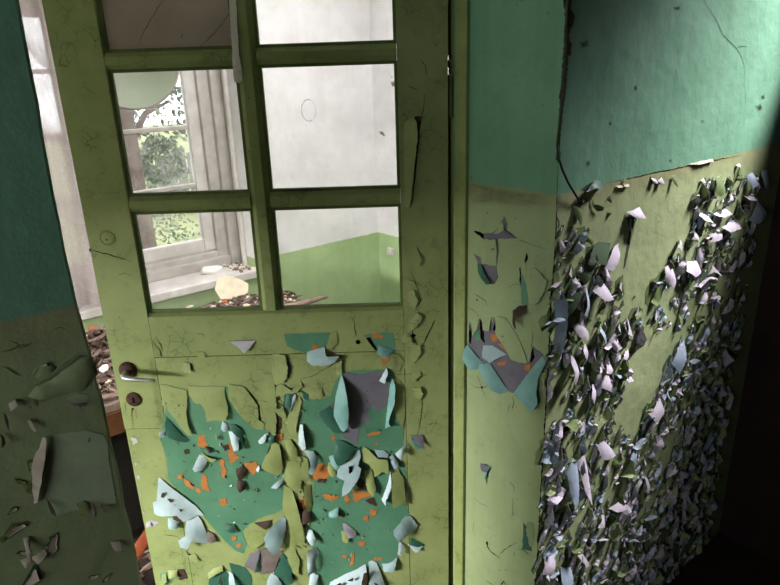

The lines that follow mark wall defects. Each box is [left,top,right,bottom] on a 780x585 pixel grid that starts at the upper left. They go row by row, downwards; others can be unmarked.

peeling [462,156,771,585]
peeling [0,400,17,448]
peeling [14,420,116,517]
peeling [143,323,425,585]
peeling [0,506,58,585]